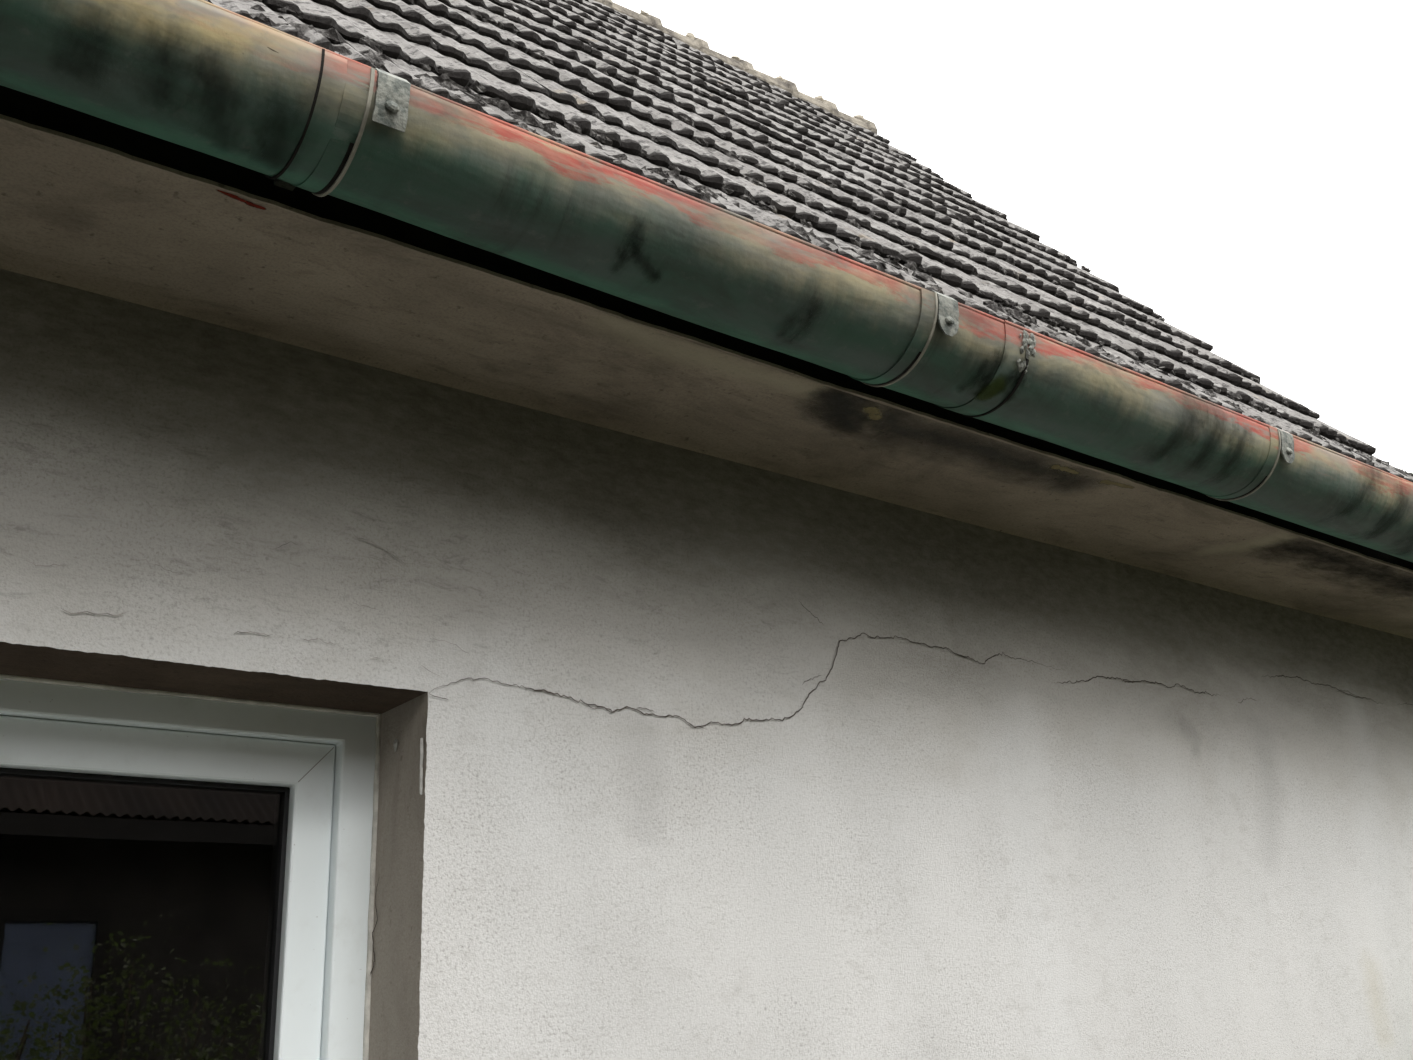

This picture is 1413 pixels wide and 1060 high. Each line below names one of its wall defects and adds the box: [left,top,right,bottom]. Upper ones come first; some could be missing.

leakage [563,307,1090,489]
leakage [1177,528,1413,596]
crack [421,601,1412,729]